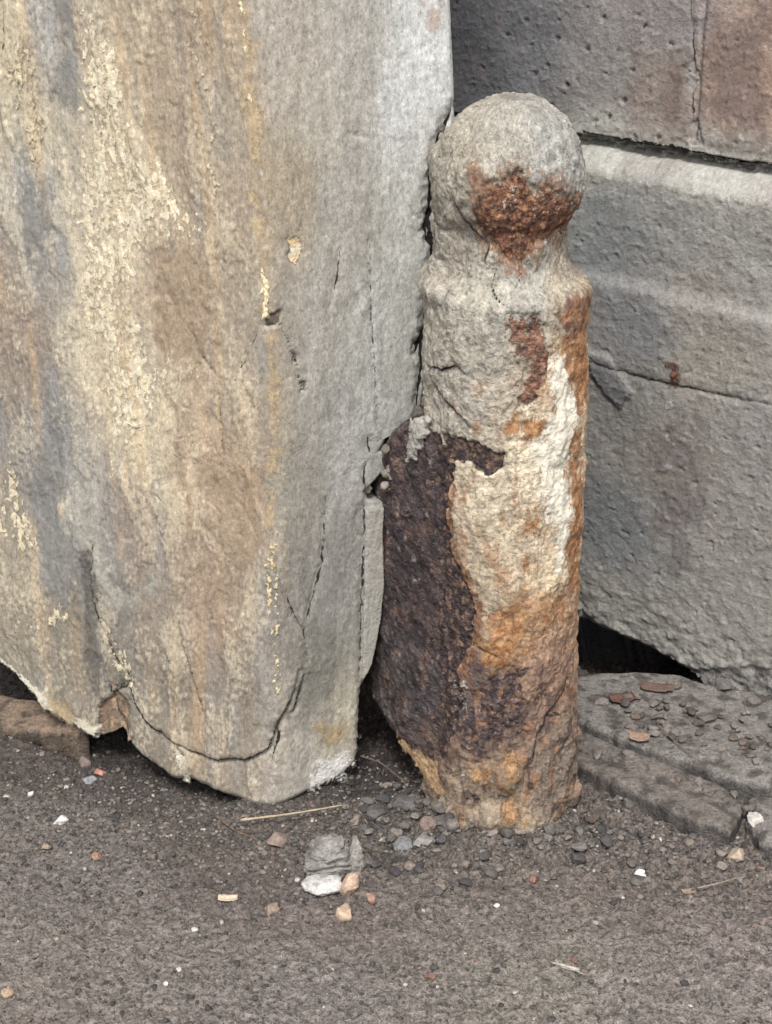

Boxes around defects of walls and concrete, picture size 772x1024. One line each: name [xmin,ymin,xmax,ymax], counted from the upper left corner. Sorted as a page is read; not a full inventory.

spalling [287,237,301,264]
corrosion [463,158,583,278]
corrosion [445,283,592,676]
crack [90,498,326,761]
crack [359,436,370,669]
spalling [405,414,527,759]
spalling [691,668,772,708]
corrosion [398,739,445,795]
corrosion [467,745,531,829]